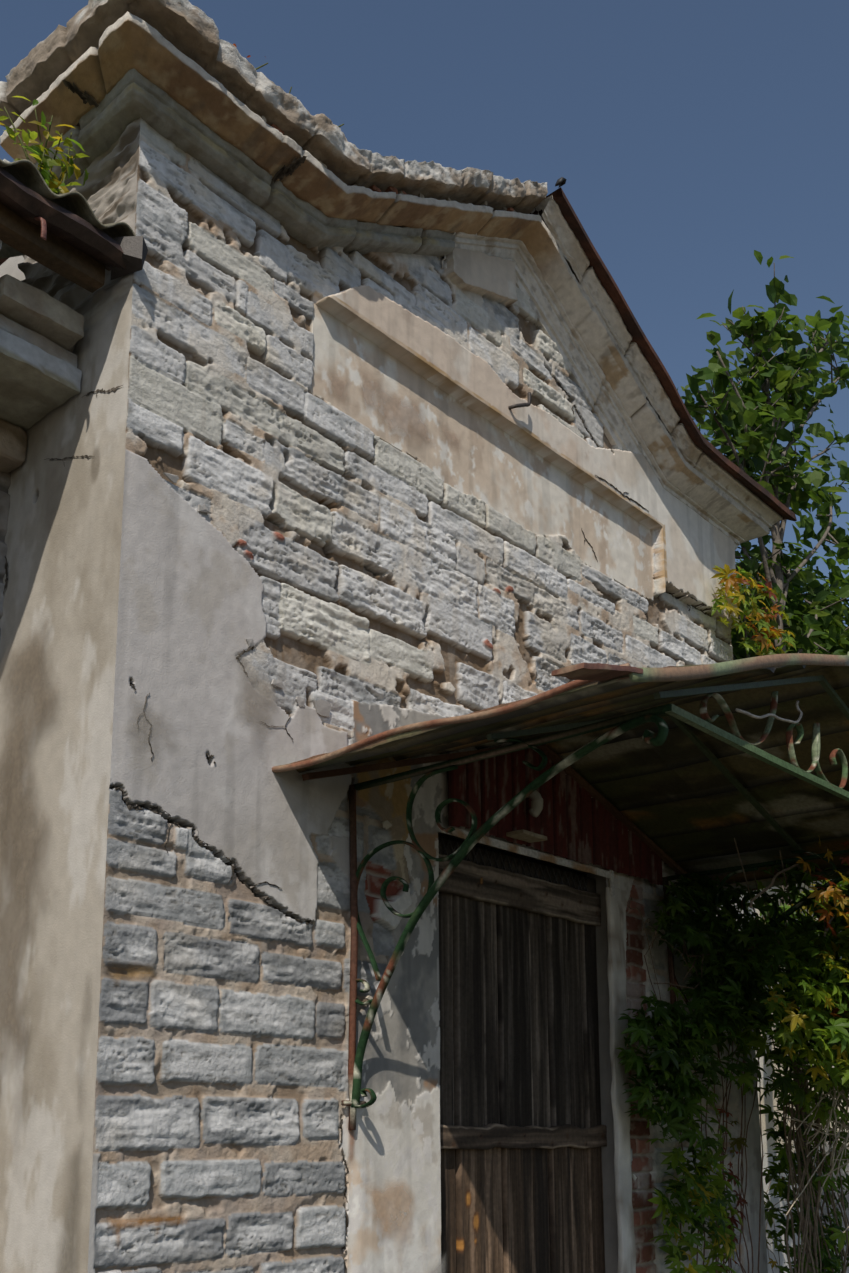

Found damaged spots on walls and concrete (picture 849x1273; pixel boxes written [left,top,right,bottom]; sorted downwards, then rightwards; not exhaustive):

spalling [125,118,735,746]
crack [130,677,154,762]
crack [110,783,314,925]
spalling [93,757,417,1273]
crack [339,1119,349,1273]